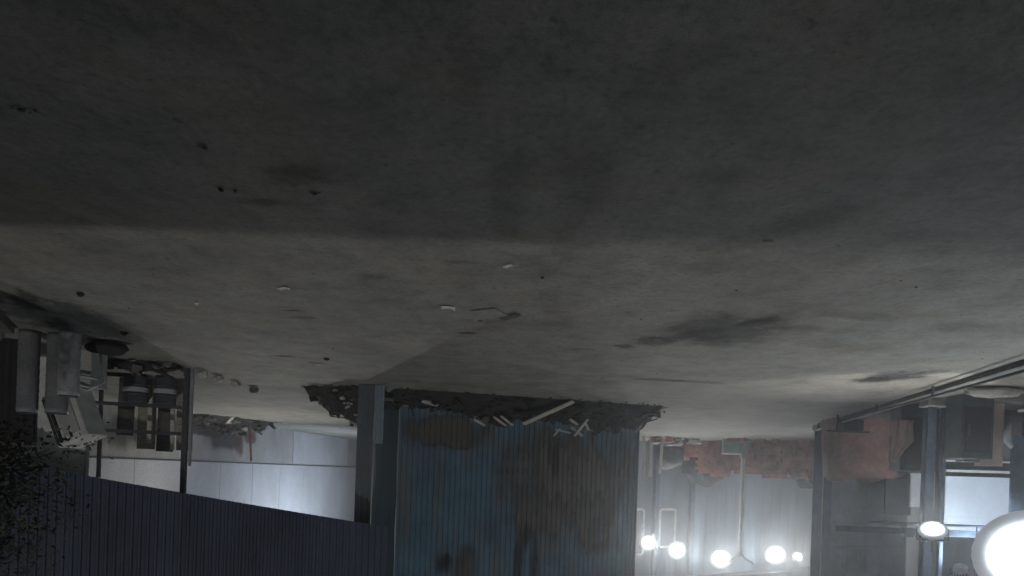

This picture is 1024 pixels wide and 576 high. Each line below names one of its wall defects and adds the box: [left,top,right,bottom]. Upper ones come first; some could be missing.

leakage [616,316,778,348]
leakage [858,372,926,382]